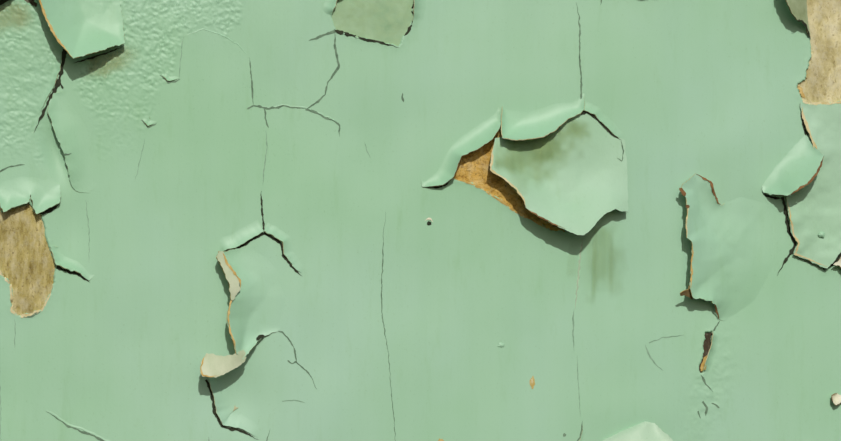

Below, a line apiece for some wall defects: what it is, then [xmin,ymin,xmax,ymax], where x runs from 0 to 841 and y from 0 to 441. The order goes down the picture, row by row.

peeling [0,164,94,318]
crack [34,49,67,132]
peeling [22,0,125,63]
crack [179,28,340,181]
peeling [309,0,426,47]
peeling [421,93,628,236]
peeling [679,0,841,373]
peeling [200,196,304,438]
crack [381,218,396,441]
crack [645,335,681,370]
crack [46,410,110,441]
peeling [603,421,673,441]